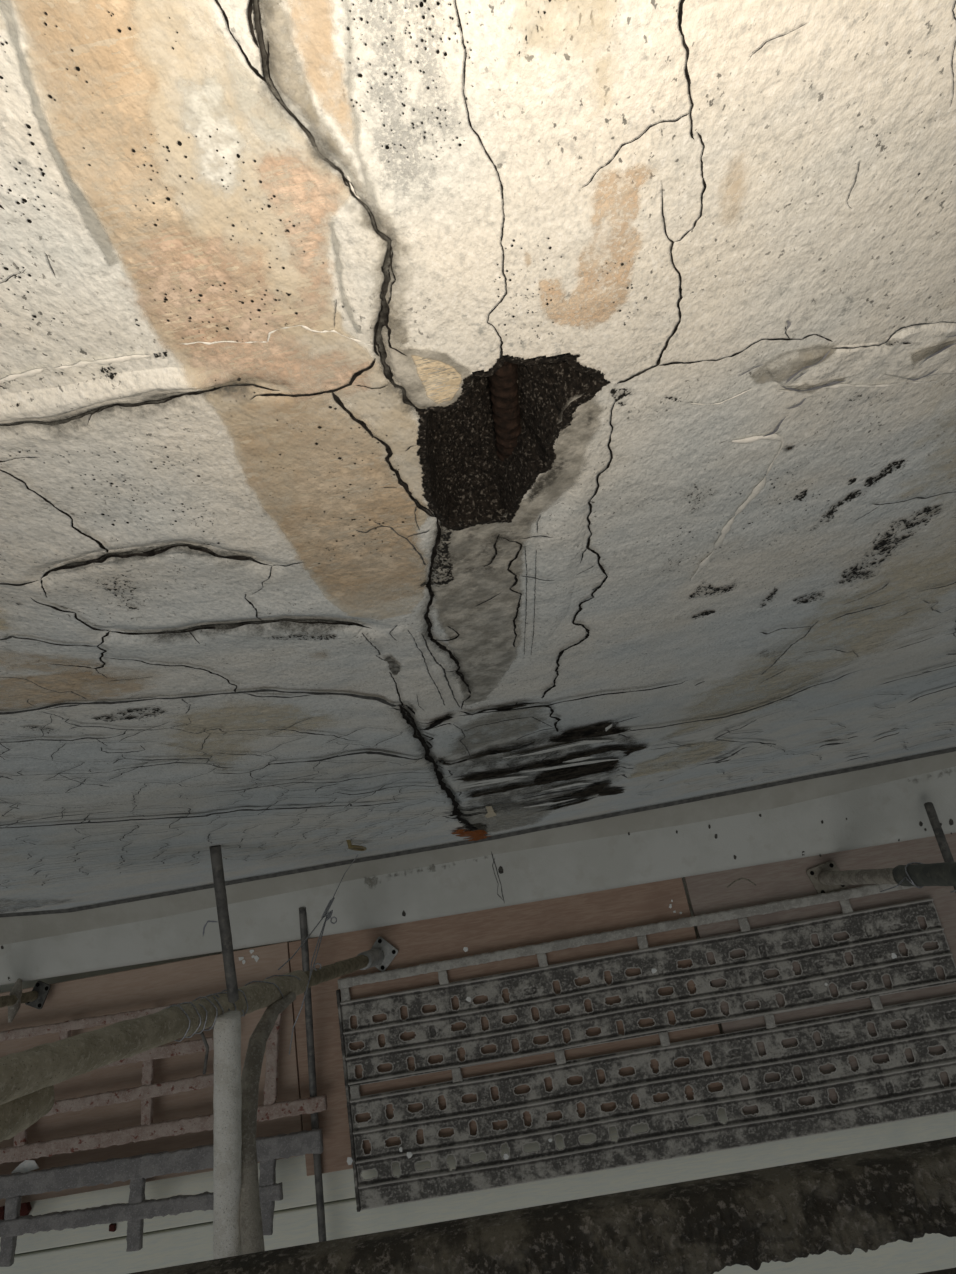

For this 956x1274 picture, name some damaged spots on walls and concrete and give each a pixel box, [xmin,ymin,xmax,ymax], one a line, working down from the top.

leakage [0,0,458,619]
leakage [540,167,649,328]
crack [0,0,956,903]
spalling [412,353,611,531]
leakage [810,460,905,531]
leakage [628,504,956,779]
corrosion [451,829,490,841]
spalling [438,742,534,766]
spalling [457,722,646,812]